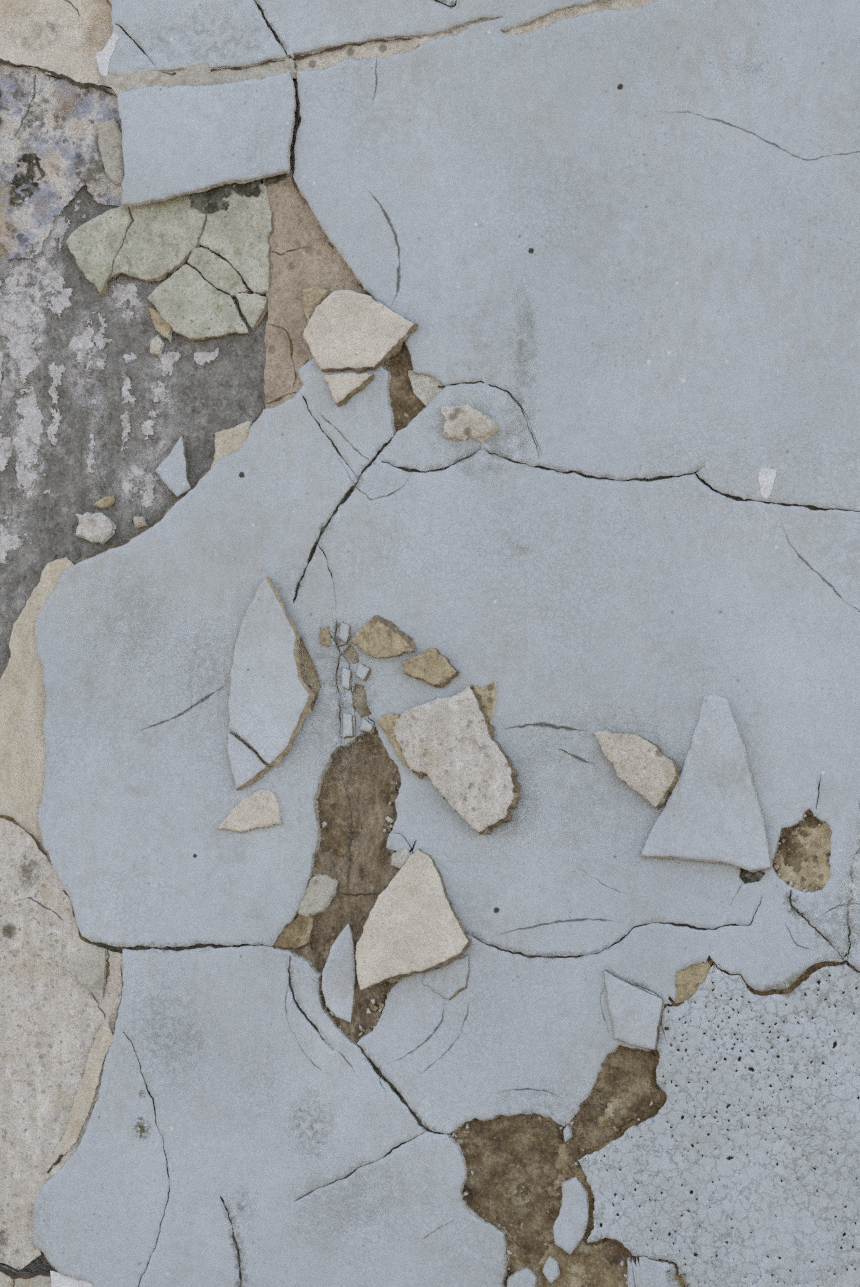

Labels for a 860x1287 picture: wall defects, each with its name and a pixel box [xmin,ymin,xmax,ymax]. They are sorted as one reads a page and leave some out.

crack [65,0,412,100]
spalling [0,0,486,679]
crack [265,324,860,601]
peeling [0,818,123,1270]
crack [0,815,263,1030]
peeling [217,577,522,1043]
crack [285,968,467,1201]
crack [557,983,687,1287]
peeling [452,961,860,1287]
crack [477,848,860,995]
peeling [593,694,832,893]
peeling [50,1271,94,1287]